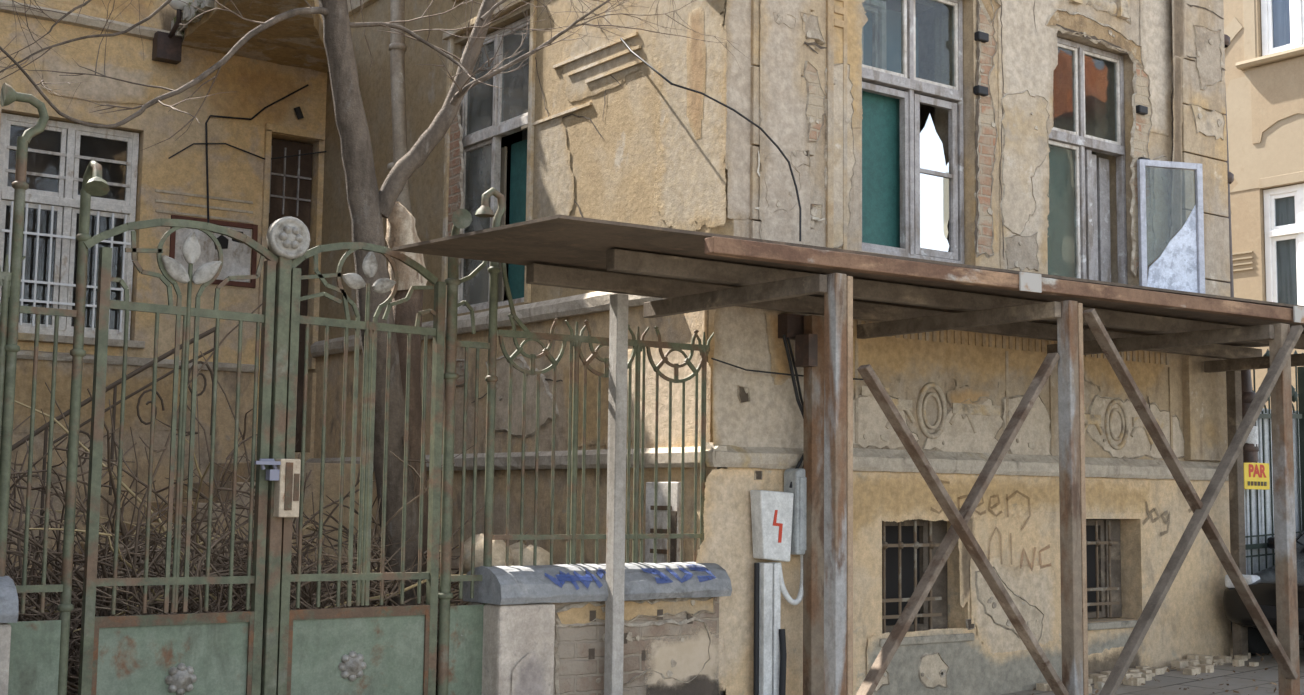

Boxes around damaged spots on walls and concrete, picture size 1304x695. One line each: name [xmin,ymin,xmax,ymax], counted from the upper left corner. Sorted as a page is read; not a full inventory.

peeling [764,61,856,249]
peeling [974,0,1050,272]
flaking render [918,651,949,689]